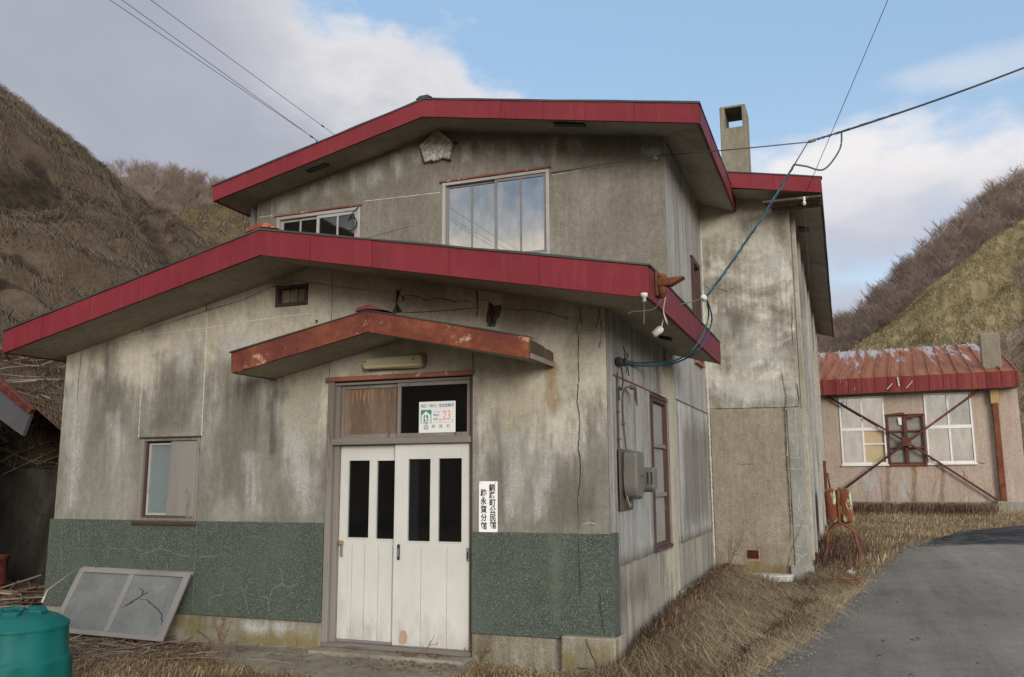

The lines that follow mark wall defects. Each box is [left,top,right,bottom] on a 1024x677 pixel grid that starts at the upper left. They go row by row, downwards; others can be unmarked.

leakage [224,338,261,354]
leakage [283,403,316,504]
crack [144,280,605,671]